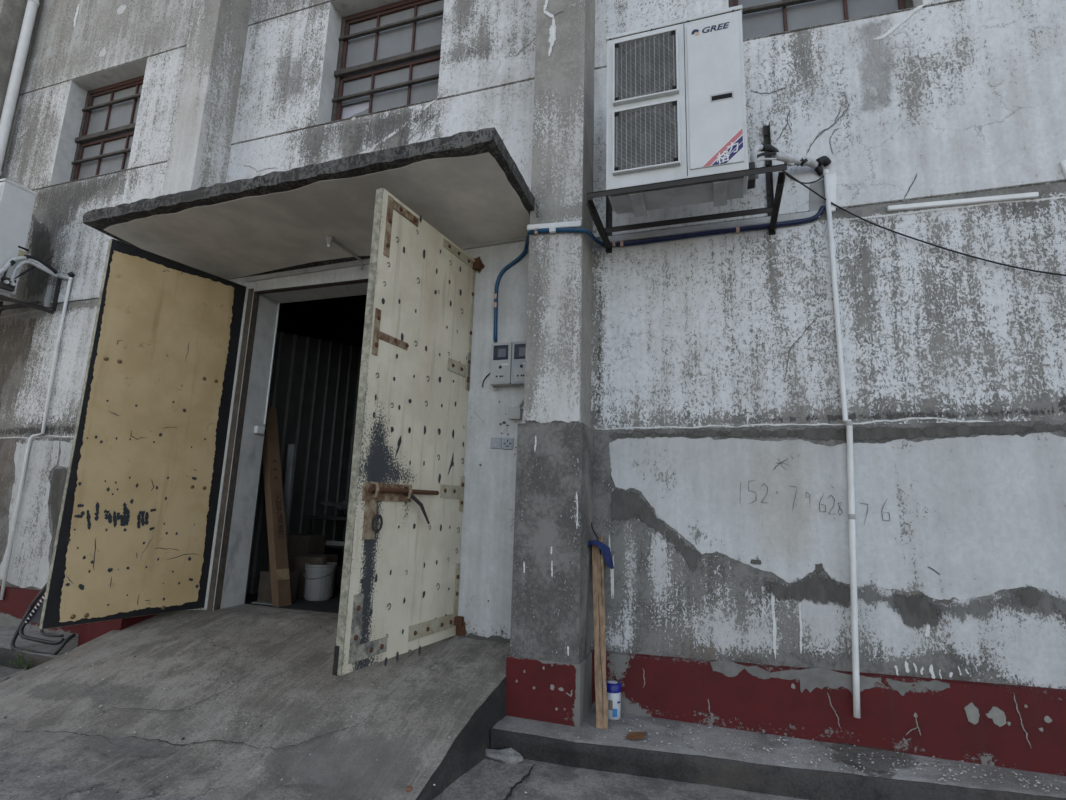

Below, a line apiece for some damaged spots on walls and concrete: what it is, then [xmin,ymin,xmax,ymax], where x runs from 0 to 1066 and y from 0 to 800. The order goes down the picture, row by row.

peeling [609,432,1066,600]
peeling [710,660,950,696]